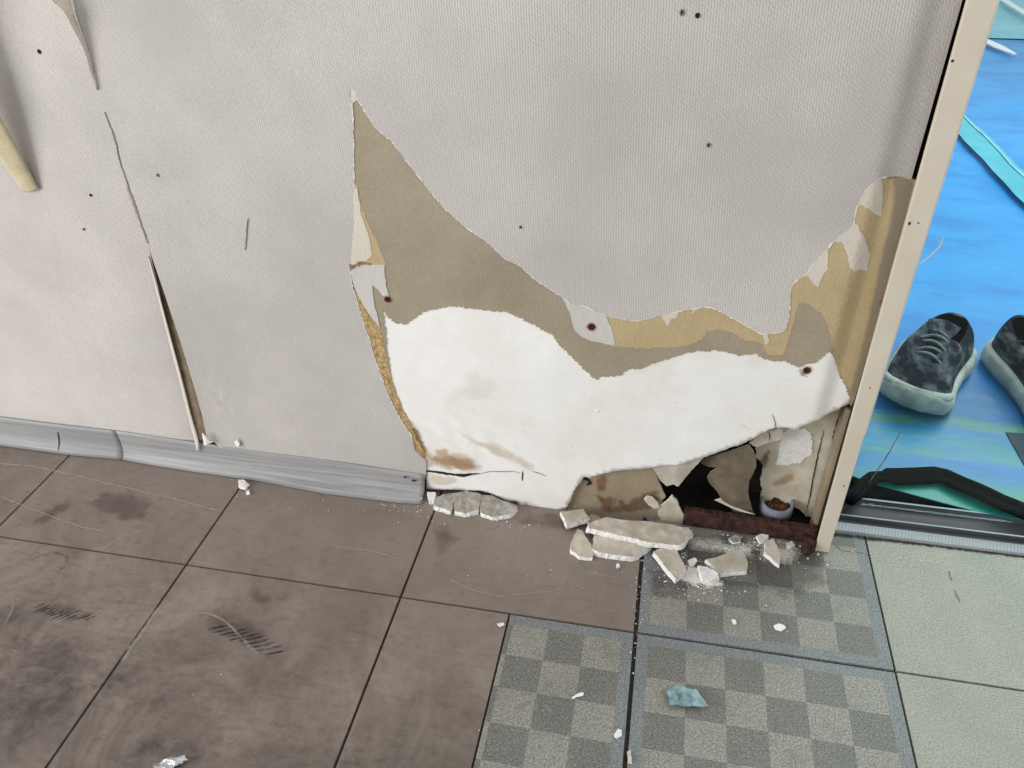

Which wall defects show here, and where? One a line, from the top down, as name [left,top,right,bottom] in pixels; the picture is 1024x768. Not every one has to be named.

peeling [52,0,98,89]
crack [87,60,148,243]
flaking render [350,89,916,525]
crack [426,470,545,502]